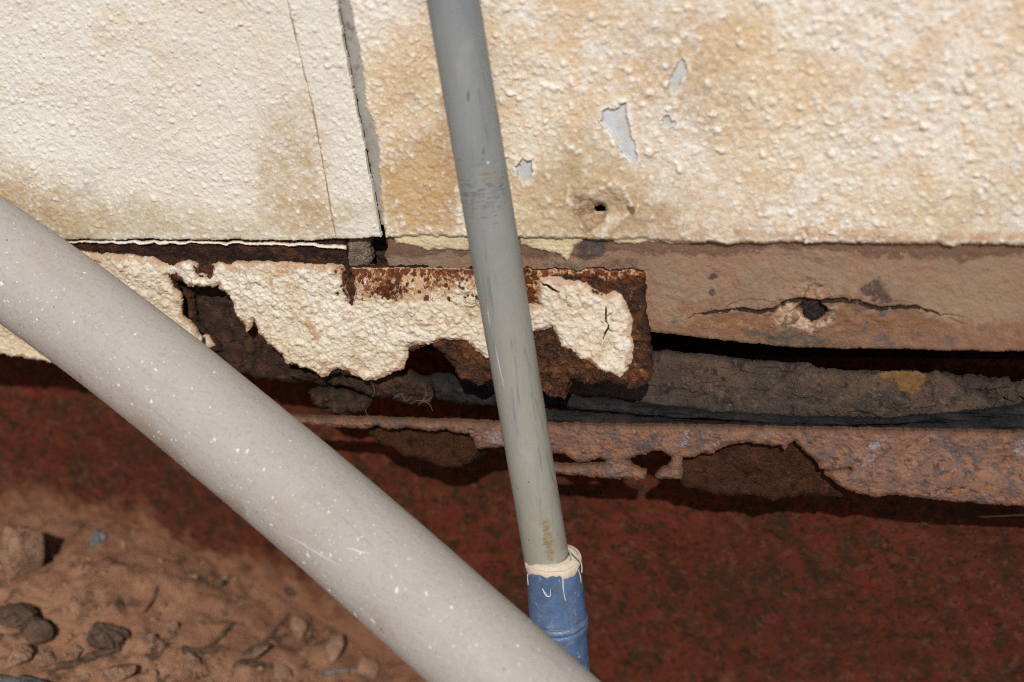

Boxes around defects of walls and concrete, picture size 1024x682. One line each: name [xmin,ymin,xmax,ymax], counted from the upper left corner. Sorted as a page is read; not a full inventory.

peeling [597,103,638,165]
peeling [514,156,533,185]
rust [317,265,478,319]
rust [523,268,644,306]
crack [689,283,967,324]
spalling [174,279,328,385]
rust [543,349,1024,431]